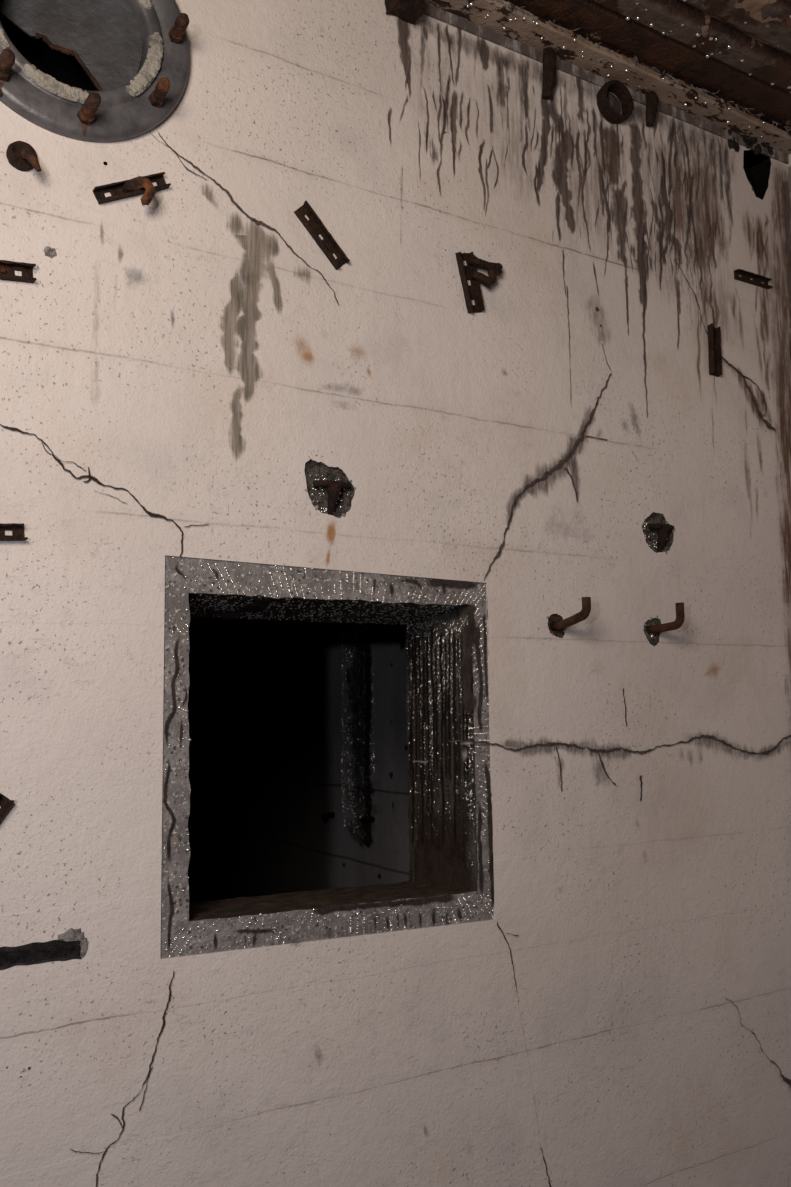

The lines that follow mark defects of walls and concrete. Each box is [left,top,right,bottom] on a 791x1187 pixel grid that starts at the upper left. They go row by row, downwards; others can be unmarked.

crack [150,132,339,305]
leakage [388,17,732,417]
crack [0,424,209,558]
leakage [222,216,282,456]
spalling [304,450,356,518]
crack [484,343,612,580]
leakage [508,414,593,516]
spalling [642,512,675,554]
leakage [738,168,791,600]
leakage [506,741,629,757]
crack [448,735,791,792]
crack [70,971,174,1187]